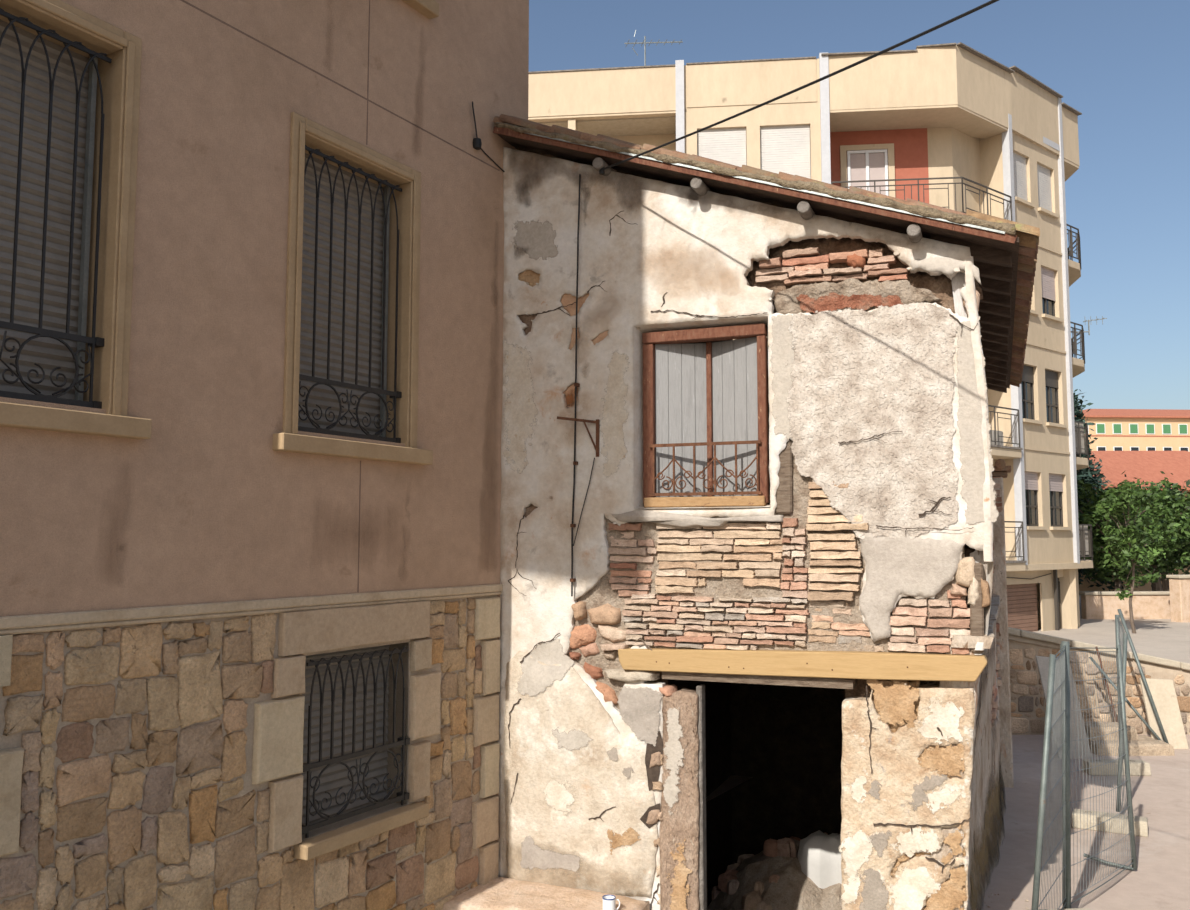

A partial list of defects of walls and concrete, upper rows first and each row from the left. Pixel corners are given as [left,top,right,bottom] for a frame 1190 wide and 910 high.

flaking render [519,312,537,335]
flaking render [518,270,540,287]
crack [535,281,607,316]
flaking render [561,237,997,709]
crack [508,515,536,596]
flaking render [867,679,920,732]
spalling [645,731,663,791]
spalling [640,803,660,828]
leakage [970,761,1005,910]